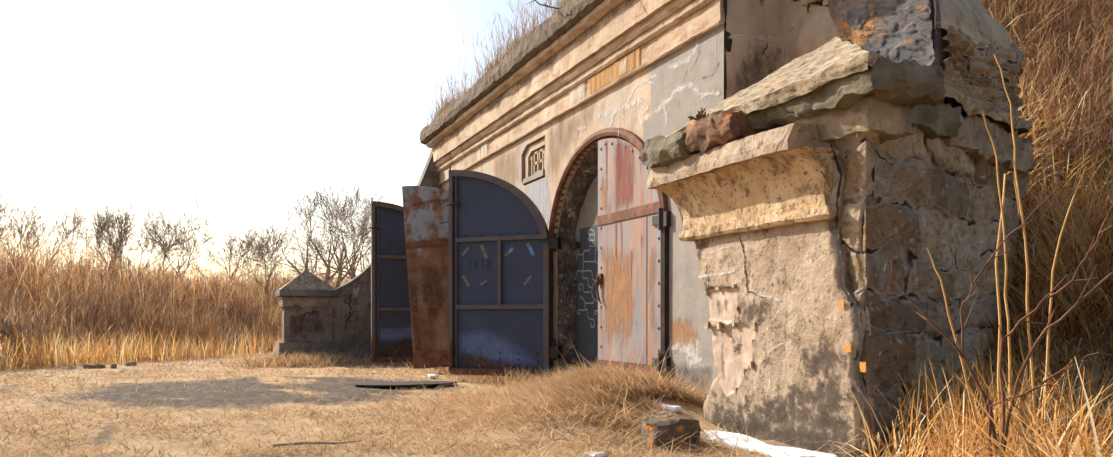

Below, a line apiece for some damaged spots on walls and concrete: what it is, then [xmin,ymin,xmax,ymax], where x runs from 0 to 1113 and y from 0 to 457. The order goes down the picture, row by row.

crack [721,0,729,100]
crack [761,0,829,59]
rust [601,139,633,211]
crack [739,237,765,298]
leakage [739,294,781,329]
crack [830,140,864,457]
leakage [669,319,857,457]